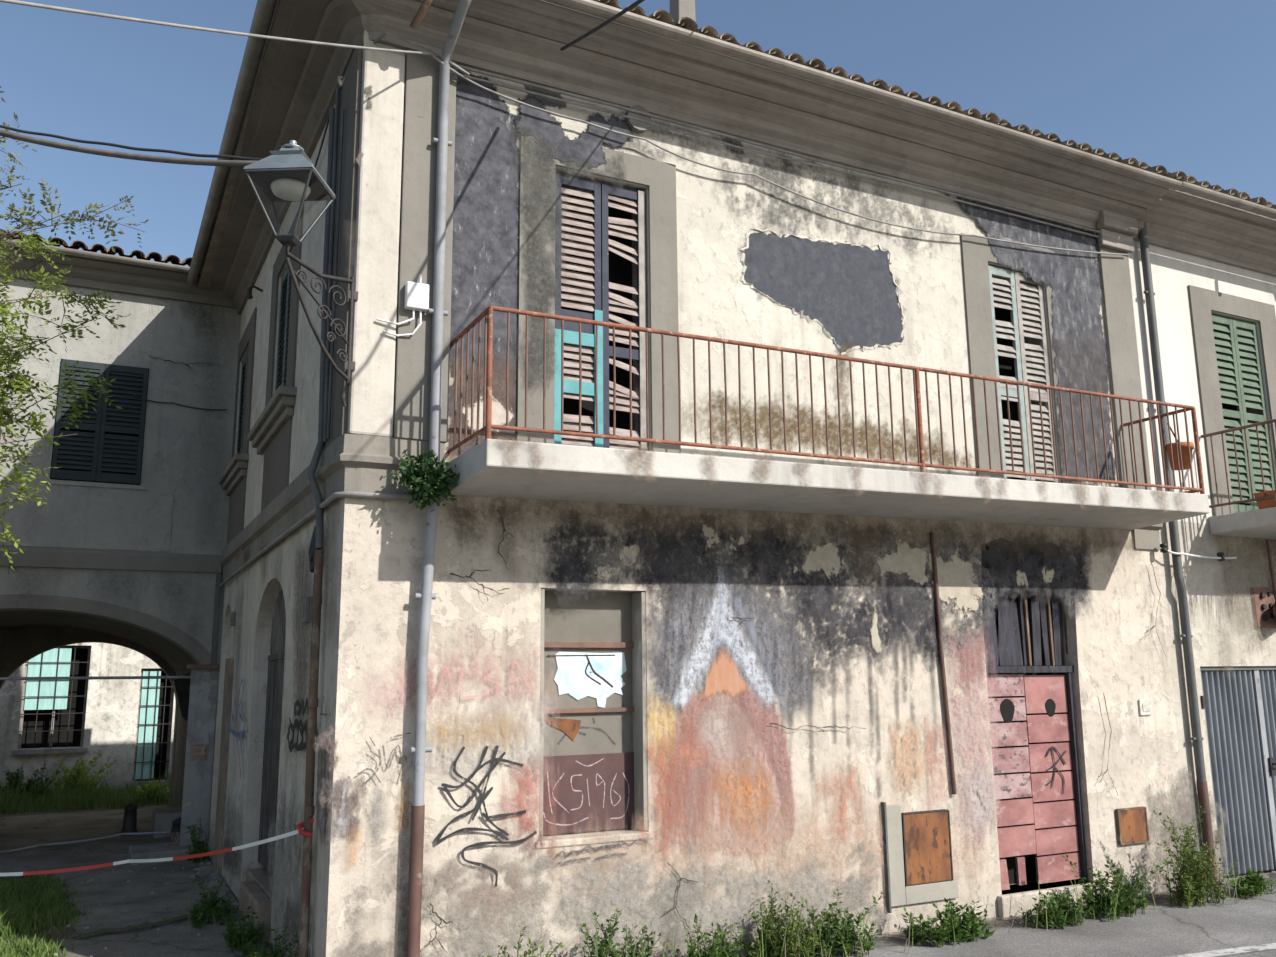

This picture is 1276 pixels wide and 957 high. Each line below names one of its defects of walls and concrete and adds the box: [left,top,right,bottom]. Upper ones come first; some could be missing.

peeling [447,69,633,462]
peeling [740,228,906,381]
damp [723,137,935,250]
peeling [946,194,1116,483]
crack [450,510,514,600]